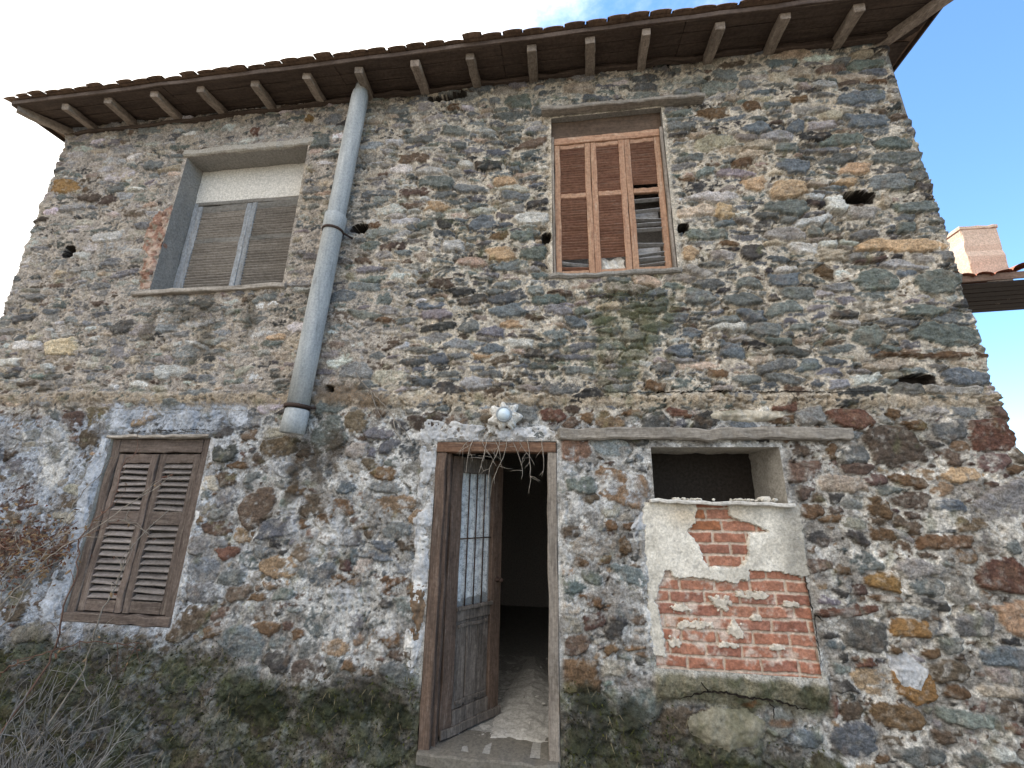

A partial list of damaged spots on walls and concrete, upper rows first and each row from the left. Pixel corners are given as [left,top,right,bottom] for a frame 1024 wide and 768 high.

peeling [567,491,584,515]
peeling [595,465,810,658]
crack [679,682,811,721]